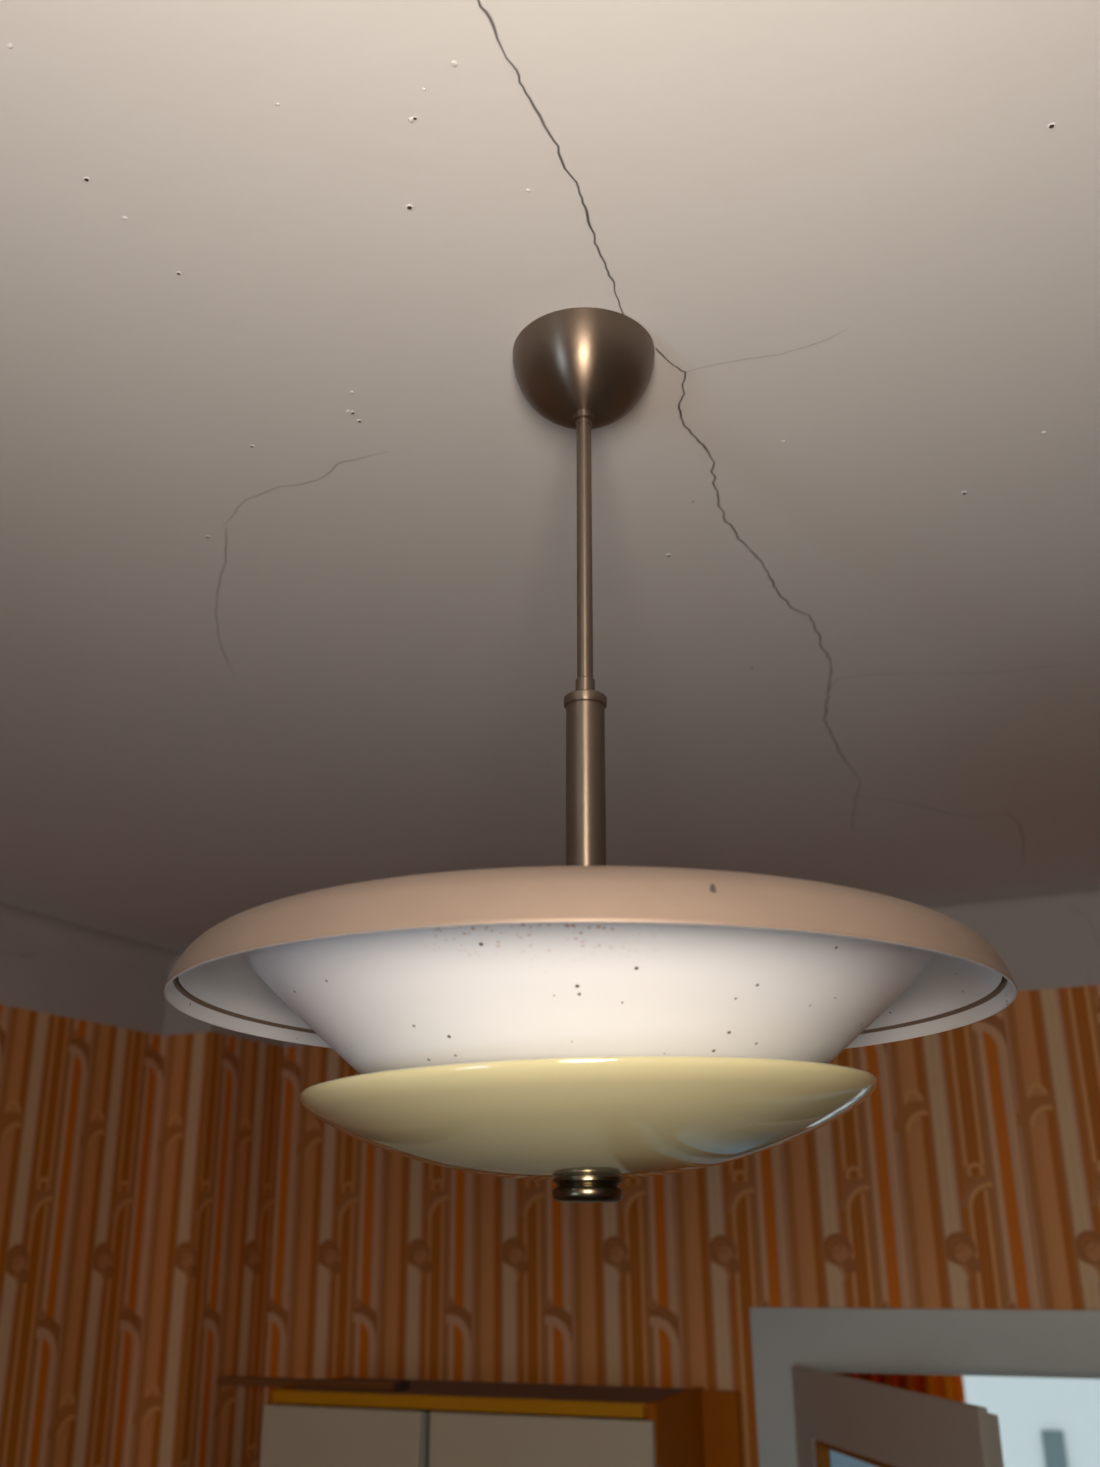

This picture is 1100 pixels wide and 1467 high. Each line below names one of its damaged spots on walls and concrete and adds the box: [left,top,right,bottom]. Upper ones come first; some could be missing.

crack [478,0,623,313]
crack [656,348,862,782]